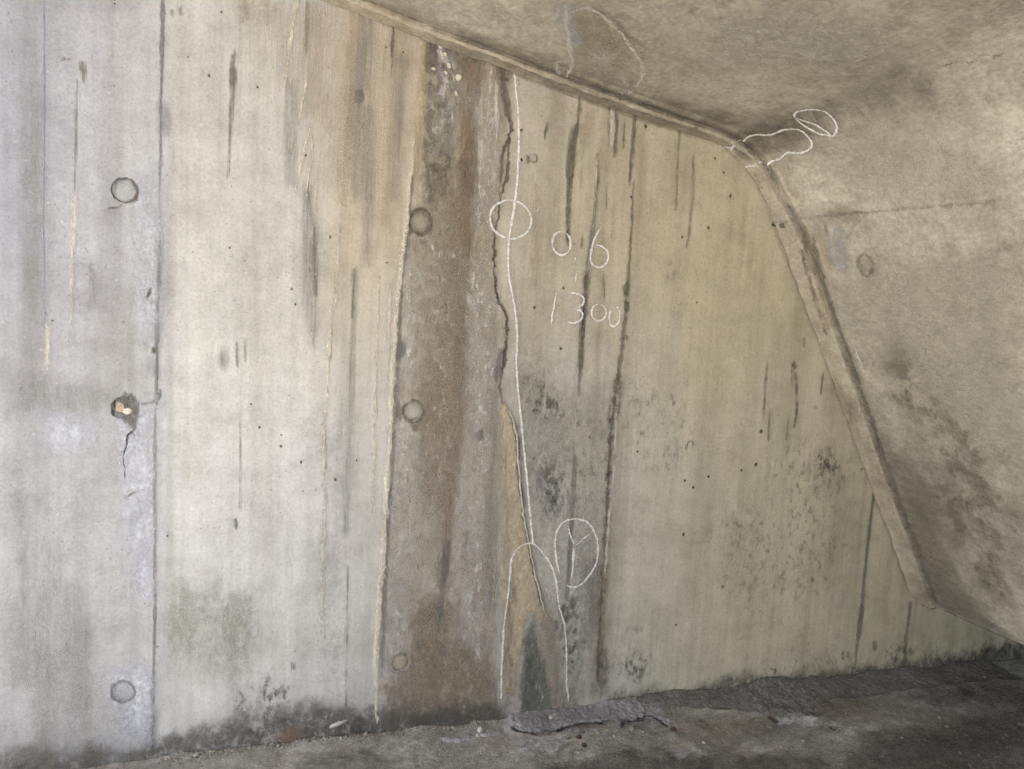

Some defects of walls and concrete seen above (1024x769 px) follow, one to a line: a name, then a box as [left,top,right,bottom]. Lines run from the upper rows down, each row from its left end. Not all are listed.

crack [492,66,514,404]
spalling [114,393,137,429]
leakage [0,38,726,769]
crack [123,426,136,496]
leakage [508,719,822,769]